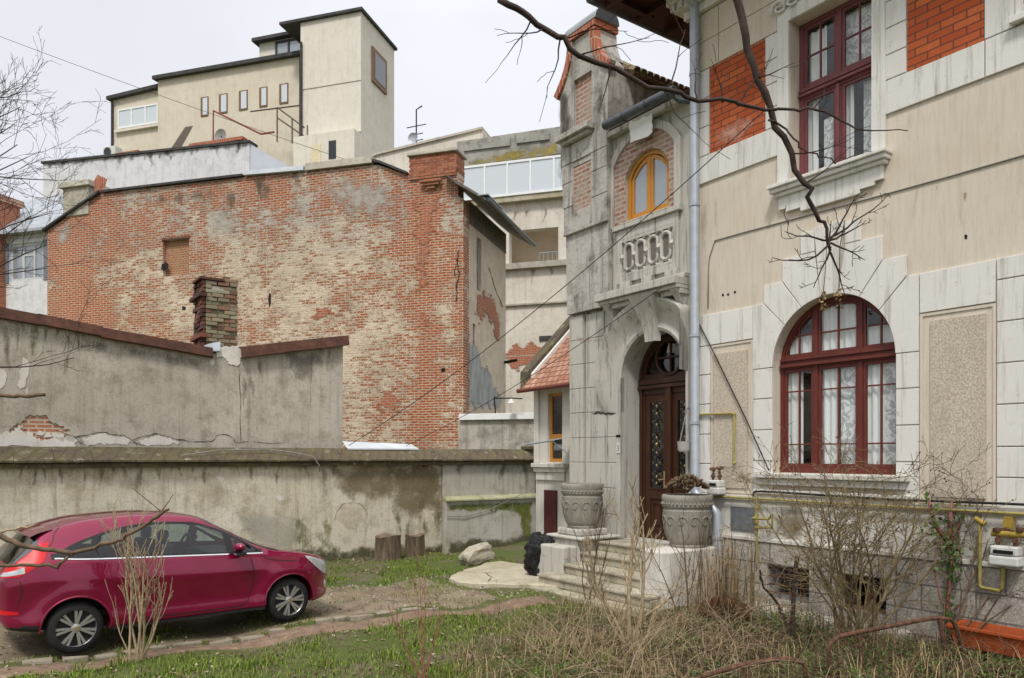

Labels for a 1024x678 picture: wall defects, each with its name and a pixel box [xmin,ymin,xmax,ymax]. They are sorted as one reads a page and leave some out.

crack [453,251,461,302]
flaking render [311,307,343,320]
flaking render [475,290,500,340]
flaking render [210,346,242,366]
flaking render [506,341,541,371]
flaking render [0,415,180,447]
water stain [335,465,531,537]